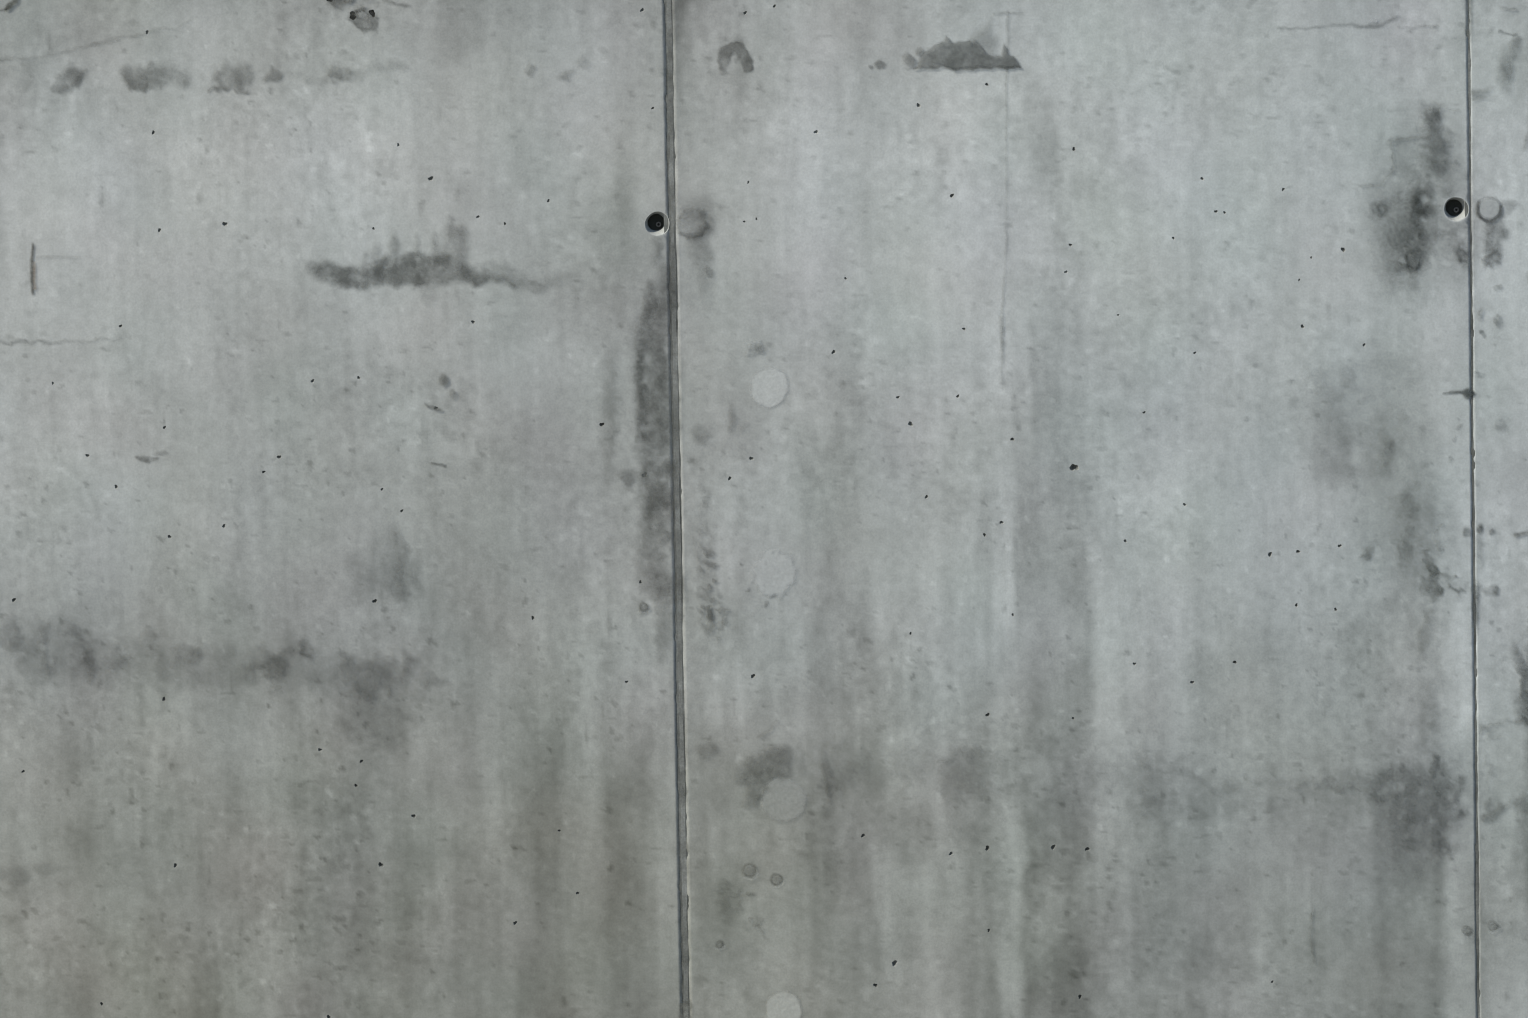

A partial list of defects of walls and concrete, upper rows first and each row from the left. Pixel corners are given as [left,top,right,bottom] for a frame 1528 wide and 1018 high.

water stain [314,254,487,287]
water stain [638,298,673,538]